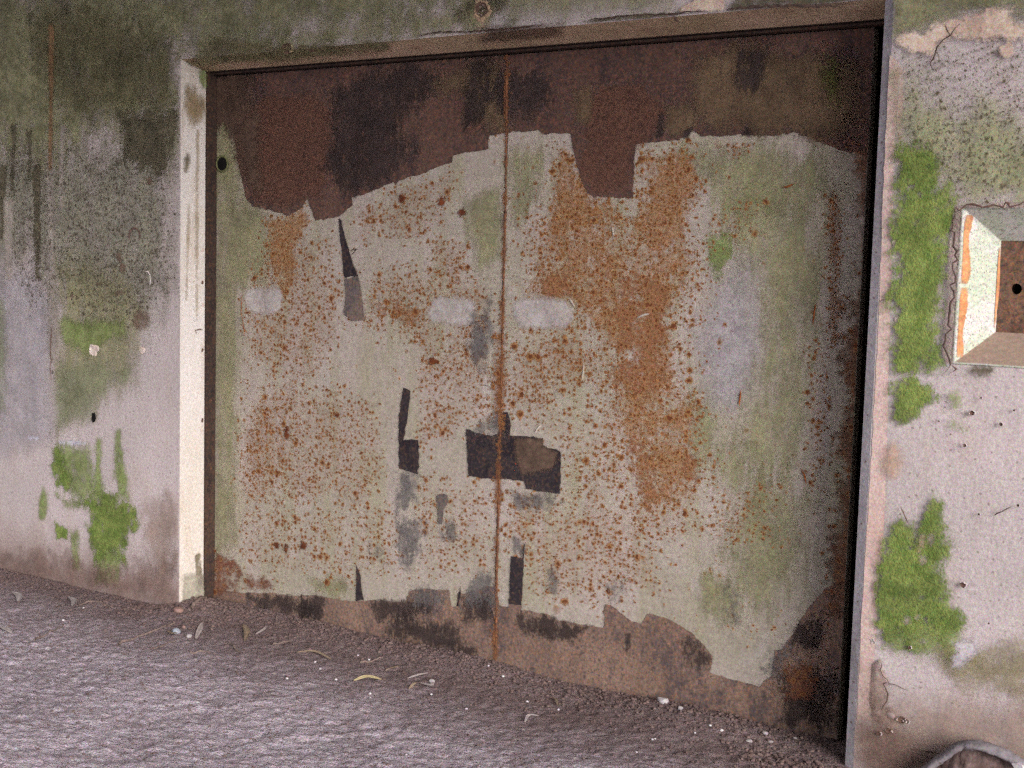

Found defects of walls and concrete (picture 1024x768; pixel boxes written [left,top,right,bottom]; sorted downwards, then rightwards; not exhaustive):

crack [929,25,956,68]
peeling [896,7,1024,58]
peeling [216,28,874,321]
water stain [0,85,206,446]
crack [943,201,1024,372]
peeling [398,388,419,474]
rust [214,133,787,659]
peeling [466,412,561,494]
peeling [214,537,845,740]